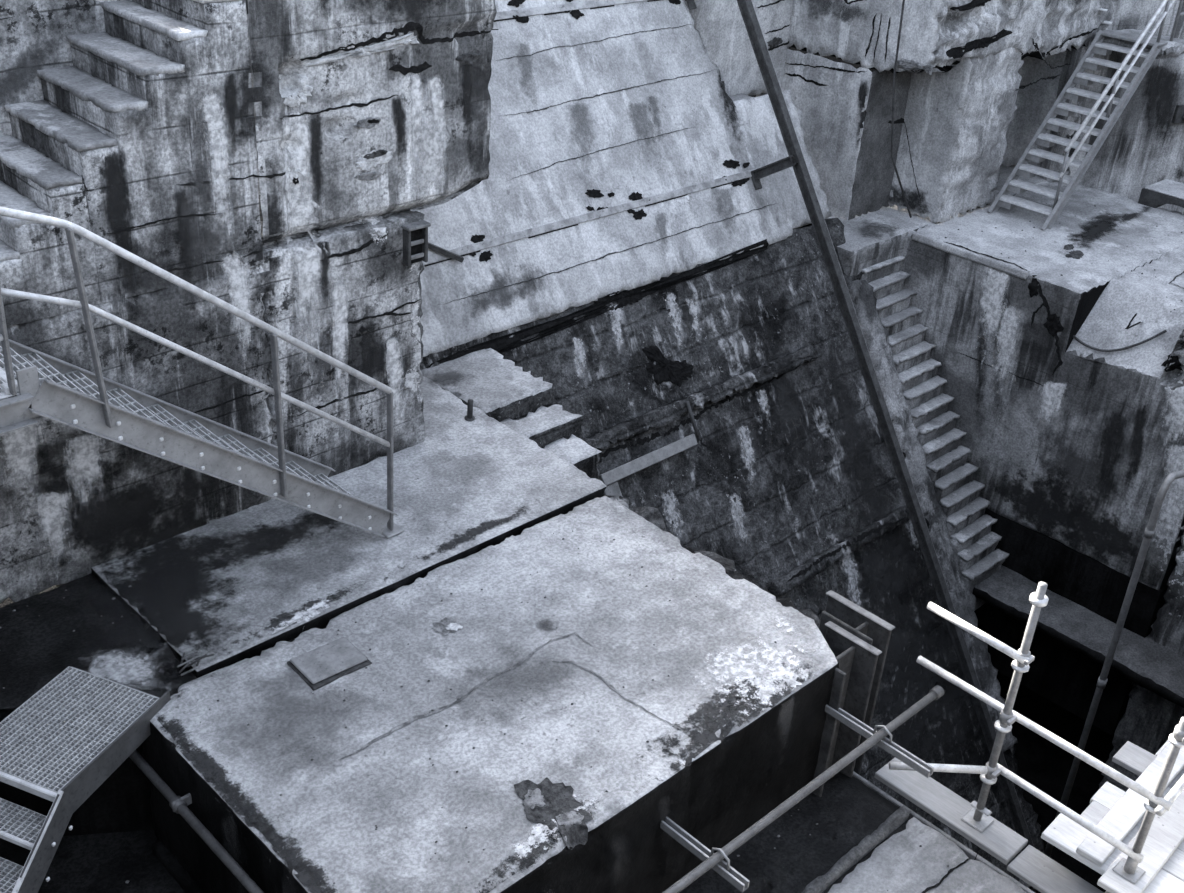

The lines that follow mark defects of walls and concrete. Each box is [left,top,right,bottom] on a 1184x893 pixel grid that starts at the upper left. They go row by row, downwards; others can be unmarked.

crack [757,0,891,86]
crack [509,70,712,115]
leakage [175,56,274,282]
spalling [354,149,393,181]
leakage [224,113,348,396]
crack [347,203,778,324]
leakage [362,334,403,423]
efflorescence [573,337,586,377]
efflorescence [667,294,701,342]
spalling [1161,329,1184,372]
crack [339,632,685,760]
spalling [506,777,598,871]